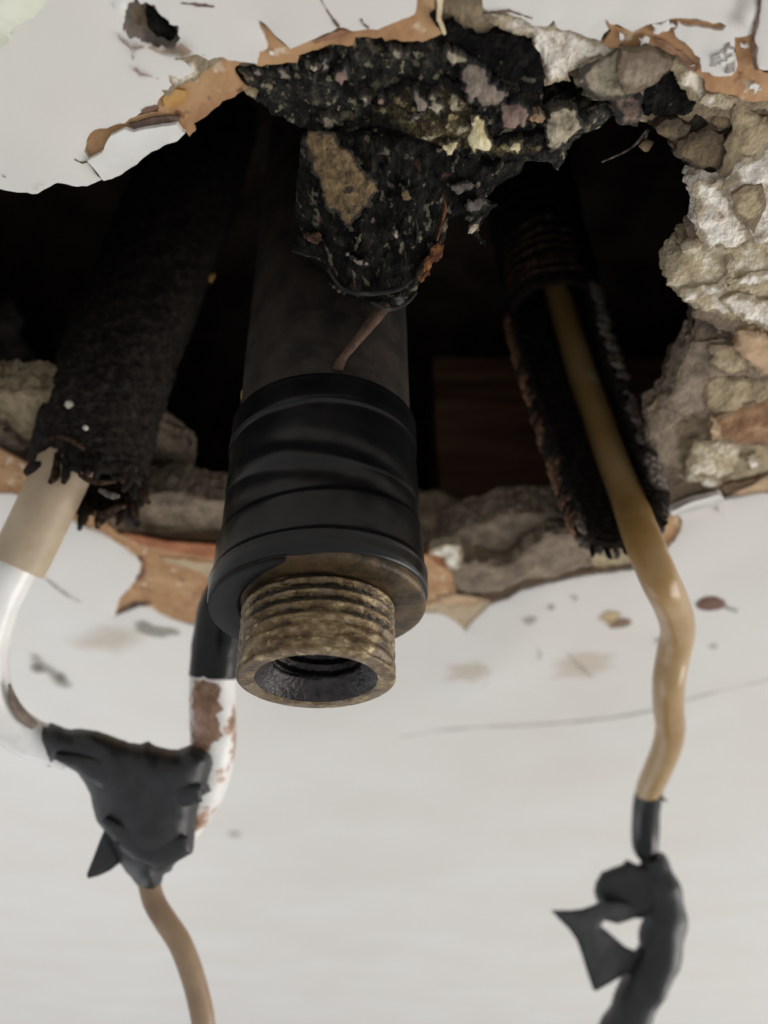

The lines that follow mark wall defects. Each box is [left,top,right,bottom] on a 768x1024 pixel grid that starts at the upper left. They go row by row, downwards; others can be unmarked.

flaking render [85,0,768,546]
flaking render [0,358,57,494]
flaking render [73,410,228,624]
flaking render [418,484,633,630]